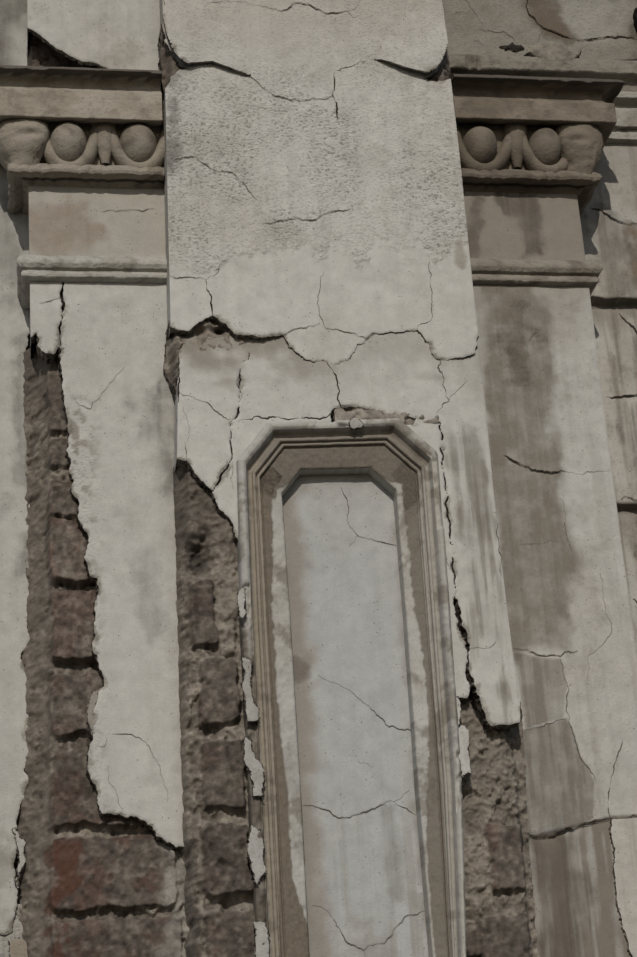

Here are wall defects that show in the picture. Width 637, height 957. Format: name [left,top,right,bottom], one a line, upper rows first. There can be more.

flaking render [163,319,245,405]
flaking render [8,343,451,957]
flaking render [456,654,590,957]